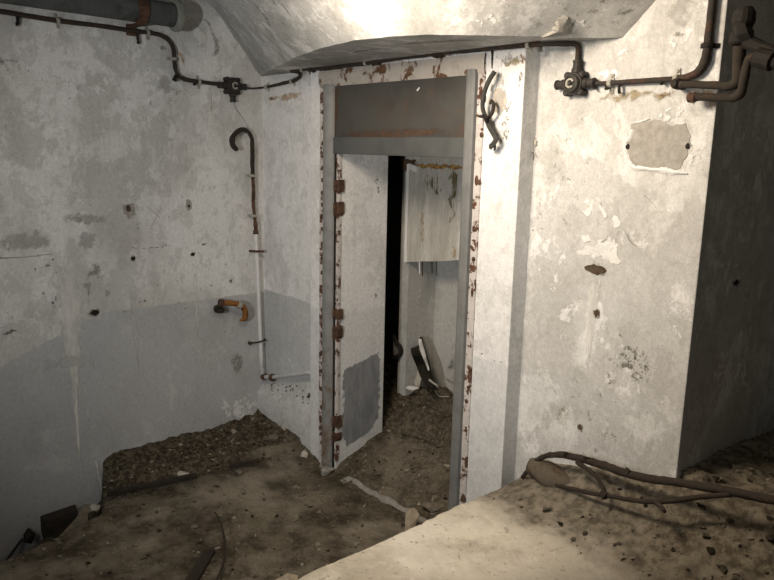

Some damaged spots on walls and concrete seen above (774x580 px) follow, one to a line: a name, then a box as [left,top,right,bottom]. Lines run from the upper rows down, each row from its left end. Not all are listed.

peeling [625,106,703,175]
peeling [583,197,621,228]
crack [0,252,53,260]
peeling [573,234,622,275]
water stain [617,346,655,382]